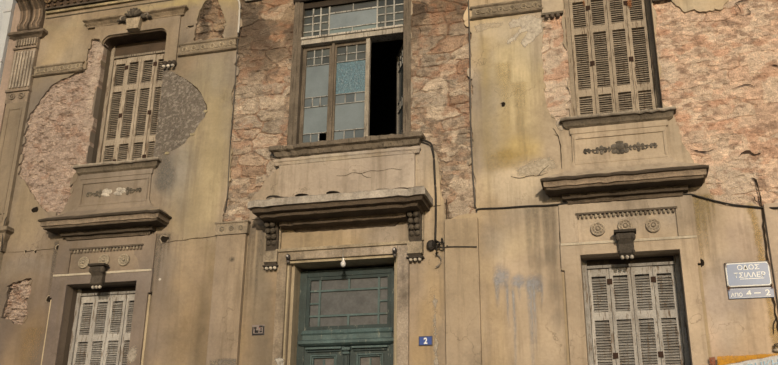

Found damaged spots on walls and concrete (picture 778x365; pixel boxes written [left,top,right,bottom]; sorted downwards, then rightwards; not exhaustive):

flaking render [17,40,108,216]
flaking render [154,67,208,158]
flaking render [186,0,227,41]
flaking render [223,0,295,222]
flaking render [411,0,572,219]
flaking render [653,0,778,206]
flaking render [4,279,33,325]